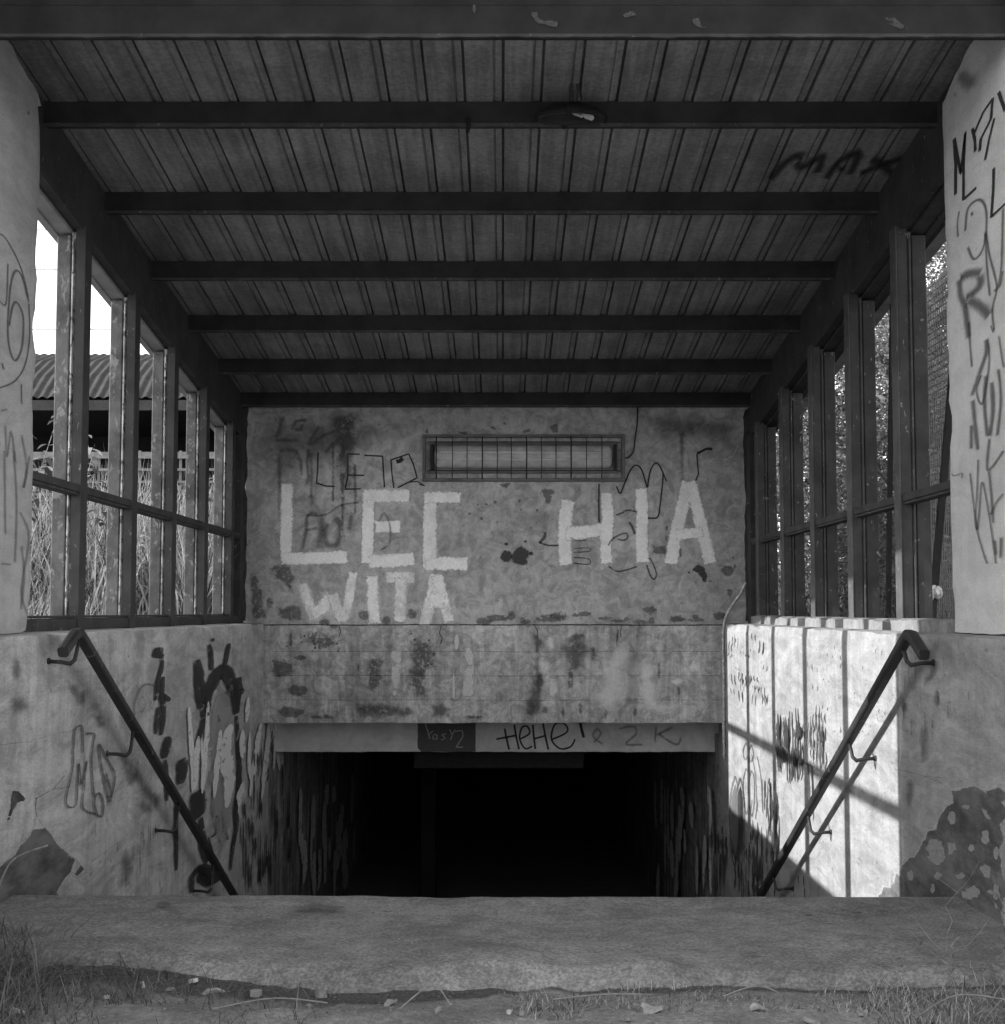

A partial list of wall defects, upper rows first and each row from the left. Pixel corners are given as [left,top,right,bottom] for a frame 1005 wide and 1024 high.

damp [358,651,411,716]
damp [452,634,474,698]
damp [527,635,595,714]
damp [595,649,627,716]
damp [634,663,673,715]
spalling [7,791,25,820]
spalling [0,828,84,903]
spalling [878,786,1005,924]